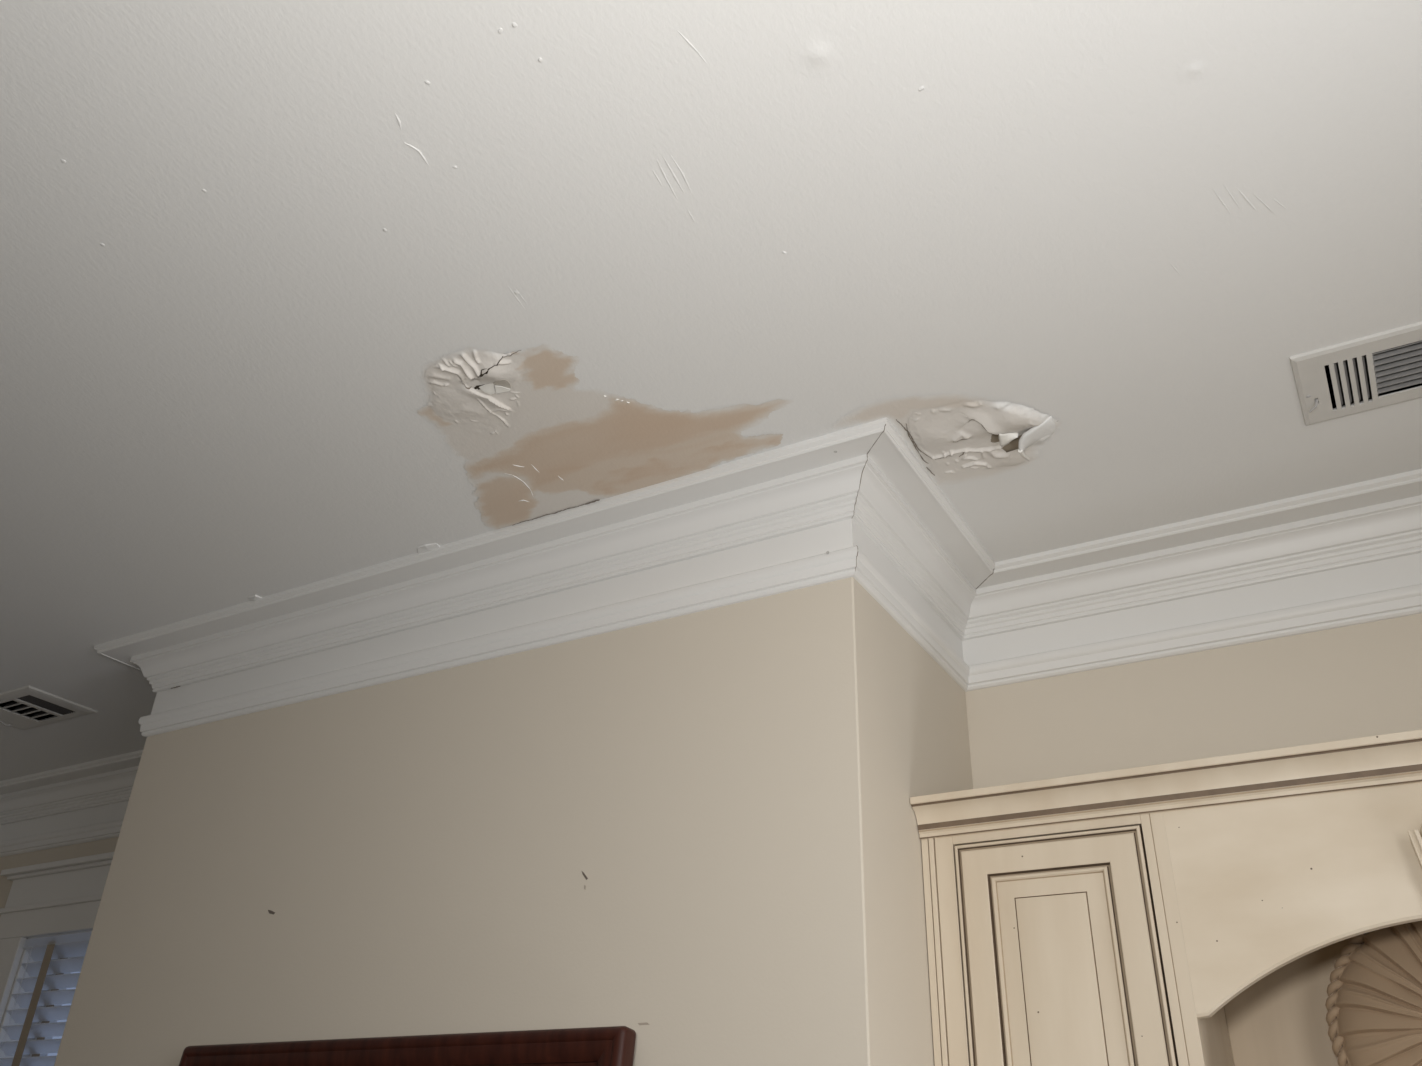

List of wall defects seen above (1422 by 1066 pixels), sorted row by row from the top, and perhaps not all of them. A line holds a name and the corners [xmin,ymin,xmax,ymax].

peeling [424,348,528,437]
peeling [906,399,1065,478]